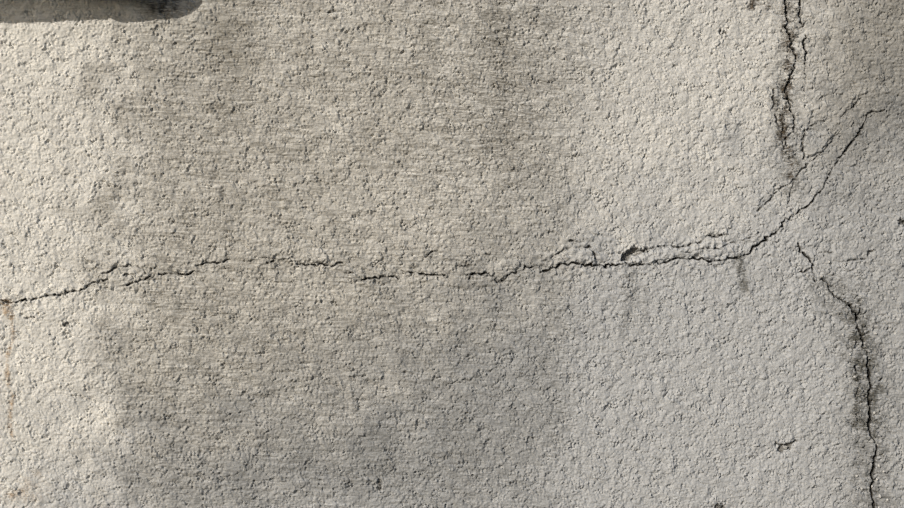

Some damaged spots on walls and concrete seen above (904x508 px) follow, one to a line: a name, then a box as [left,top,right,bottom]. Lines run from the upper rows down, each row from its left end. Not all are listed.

crack [7,259,228,303]
crack [300,251,445,281]
crack [466,0,884,283]
crack [797,243,889,508]